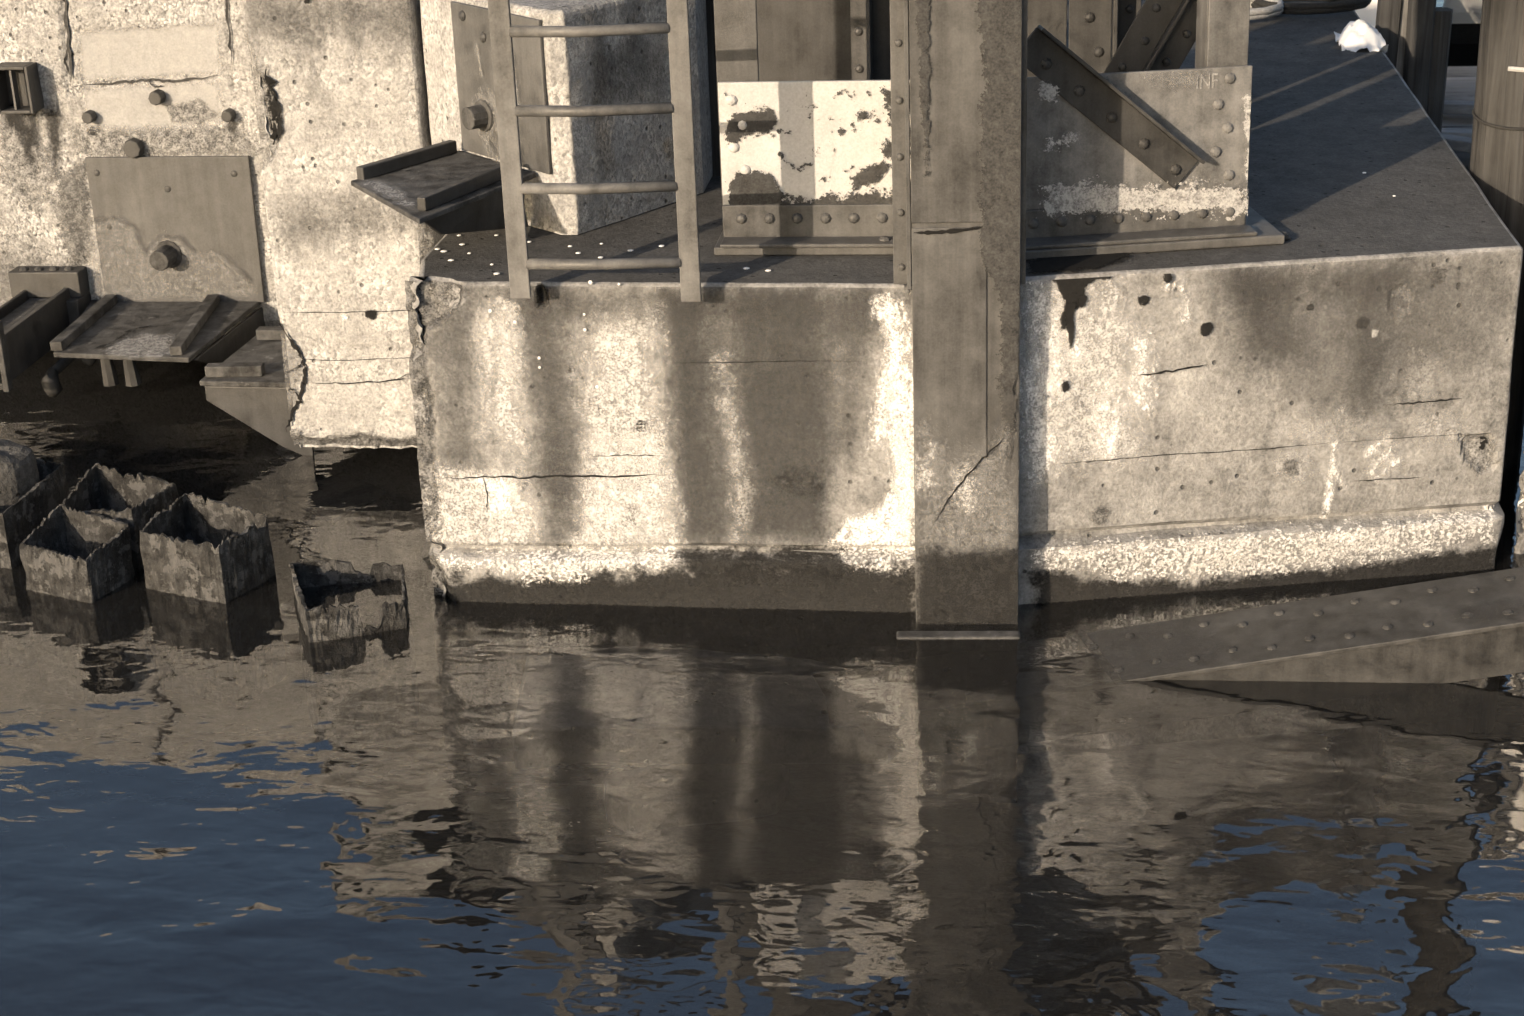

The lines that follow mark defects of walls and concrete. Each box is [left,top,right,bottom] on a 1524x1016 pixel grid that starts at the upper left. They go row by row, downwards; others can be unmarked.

crack [63,0,280,145]
spalling [0,34,284,300]
peeling [725,86,892,205]
crack [280,310,410,432]
leakage [432,464,539,560]
leakage [481,299,524,449]
crack [438,454,662,509]
leakage [571,291,915,550]
crack [932,436,1006,526]
leakage [1019,280,1158,483]
spalling [1463,435,1494,474]